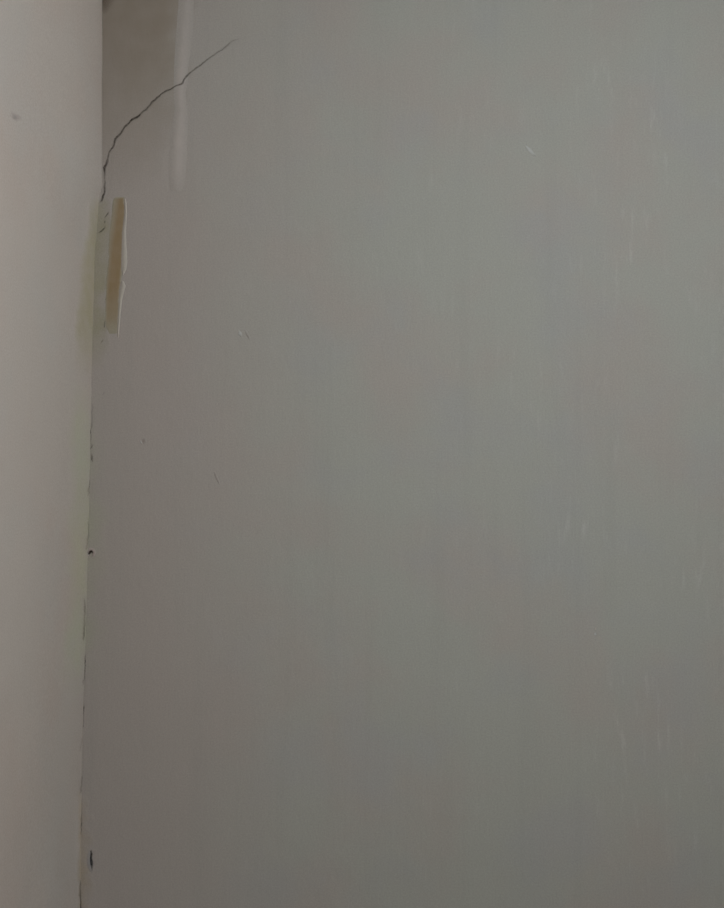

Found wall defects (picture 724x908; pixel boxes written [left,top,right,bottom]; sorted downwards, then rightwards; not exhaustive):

crack [101,84,180,201]
peeling [105,197,127,337]